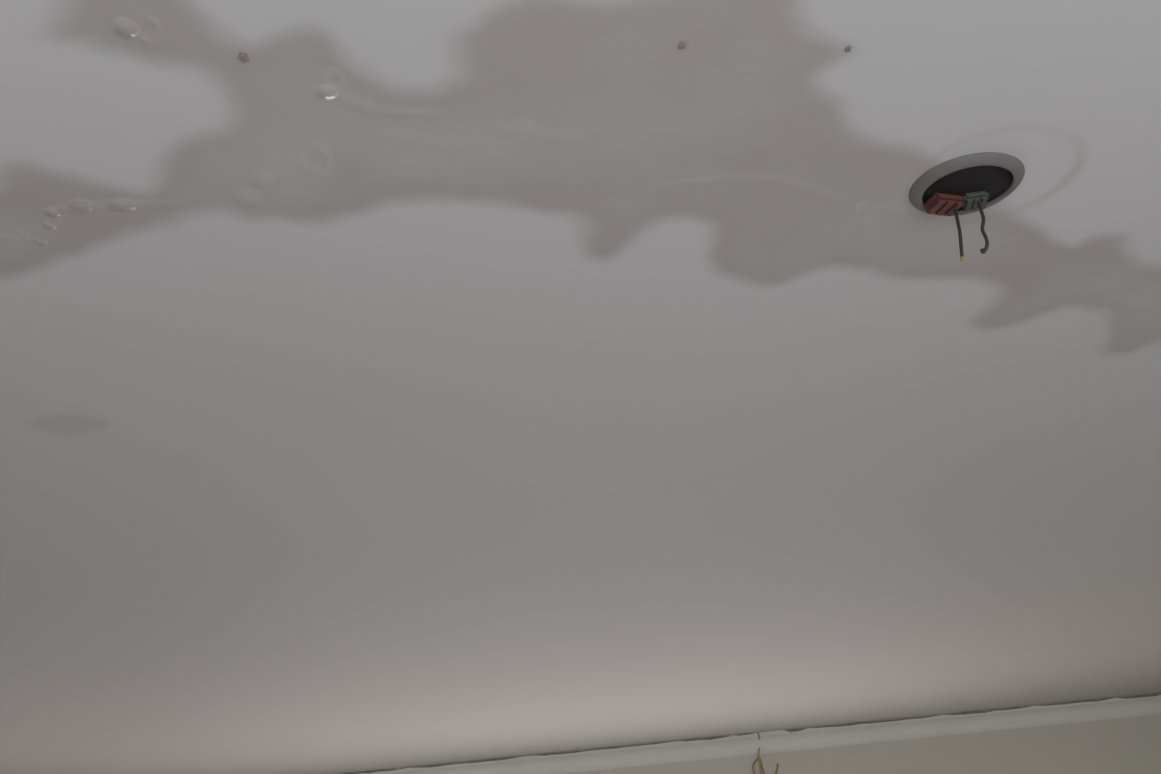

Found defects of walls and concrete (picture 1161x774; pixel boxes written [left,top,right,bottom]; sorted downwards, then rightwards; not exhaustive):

leakage [0,0,1161,361]